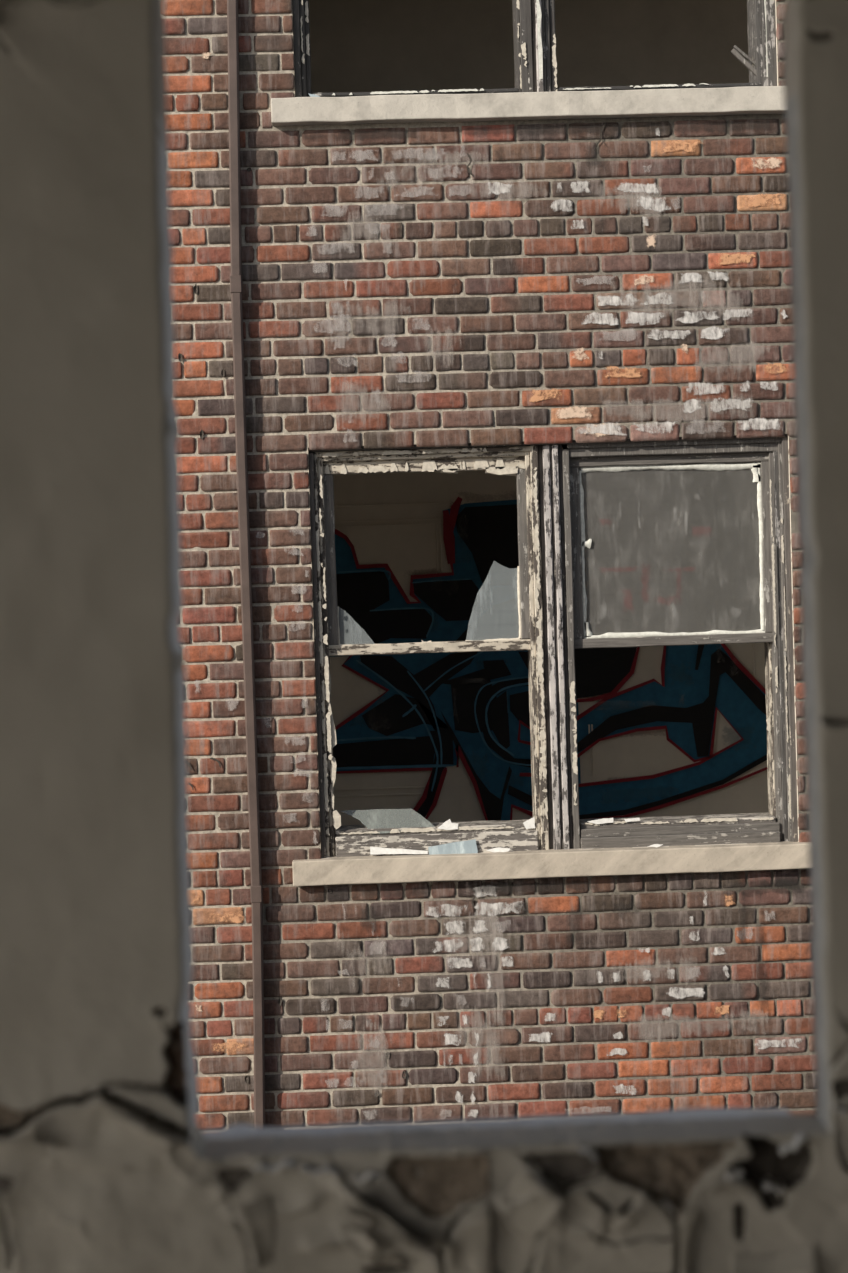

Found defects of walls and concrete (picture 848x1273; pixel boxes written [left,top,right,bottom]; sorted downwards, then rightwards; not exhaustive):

peeling [516,0,611,91]
damp [618,183,667,226]
damp [584,272,752,340]
damp [580,381,779,435]
peeling [315,448,578,837]
peeling [770,479,789,742]
peeling [584,817,774,826]
damp [426,885,523,988]
damp [642,965,705,1039]
damp [439,1016,495,1118]
crack [0,1082,192,1138]
crack [590,1193,679,1273]